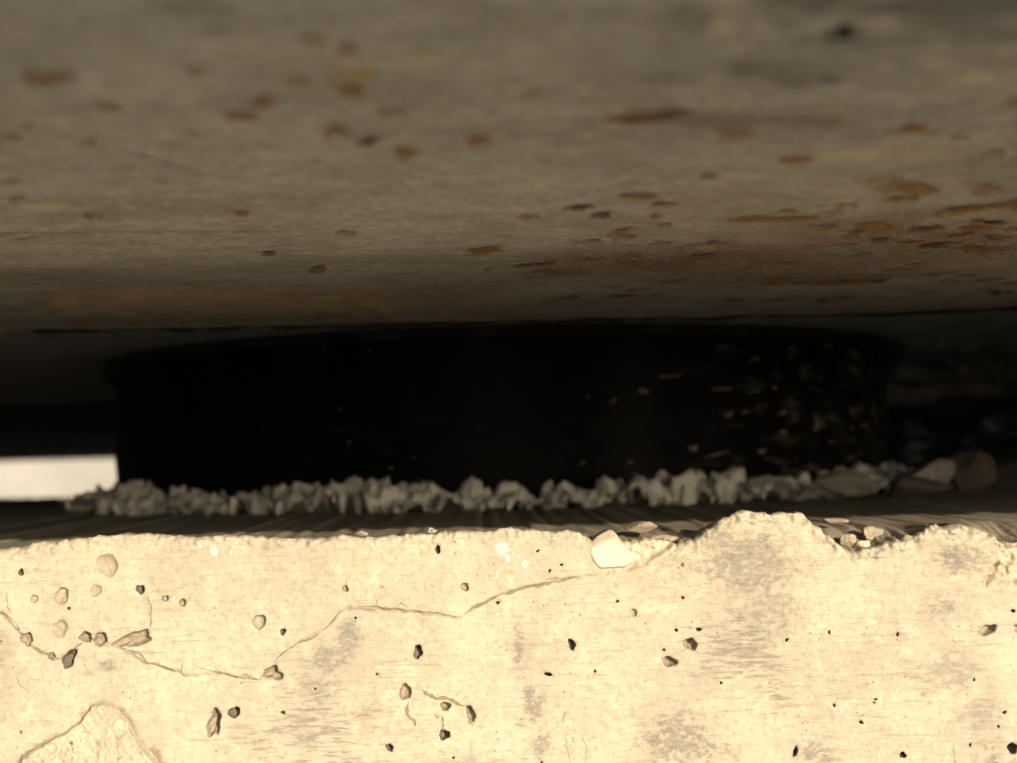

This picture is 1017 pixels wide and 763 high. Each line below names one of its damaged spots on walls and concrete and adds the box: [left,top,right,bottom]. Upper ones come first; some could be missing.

rust [609,109,689,124]
rust [849,201,1017,253]
spalling [983,538,1017,589]